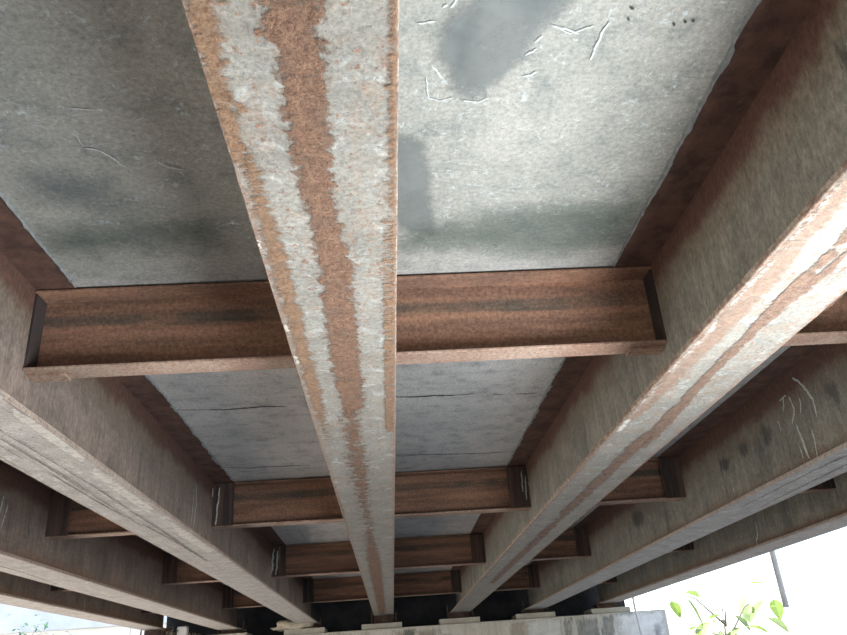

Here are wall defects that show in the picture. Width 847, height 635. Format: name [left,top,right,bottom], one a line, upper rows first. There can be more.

corrosion [383,0,397,207]
water stain [440,0,564,96]
water stain [397,139,434,232]
corrosion [187,0,387,614]
corrosion [382,220,395,432]
crack [396,392,469,400]
corrosion [491,179,847,583]
corrosion [0,429,208,562]
water stain [527,610,667,635]